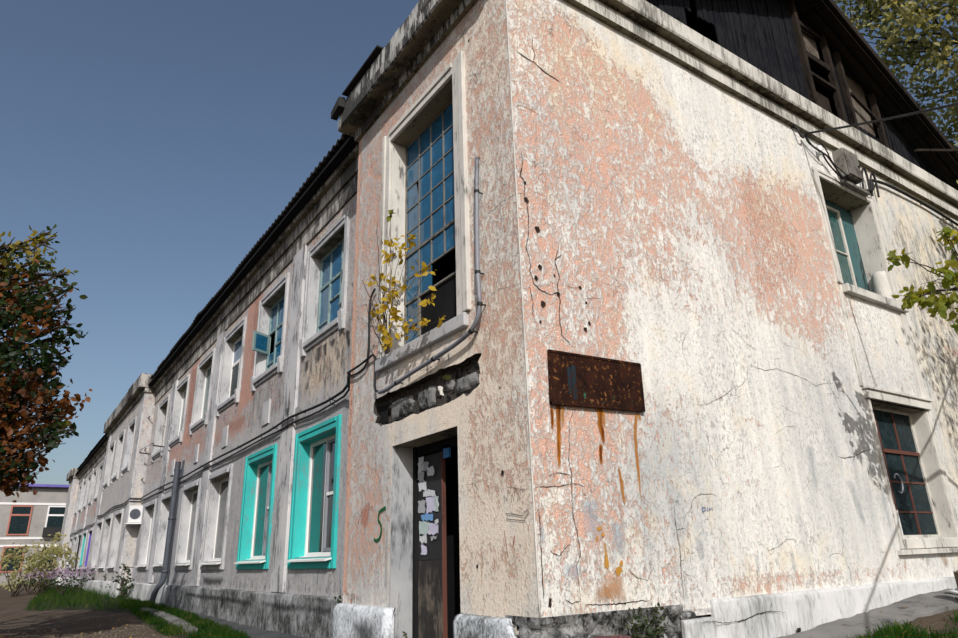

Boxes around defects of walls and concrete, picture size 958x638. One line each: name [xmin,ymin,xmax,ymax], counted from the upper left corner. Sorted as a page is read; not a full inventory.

crack [467,39,561,83]
crack [487,154,596,343]
spalling [374,353,481,426]
crack [708,330,826,404]
rust [550,405,564,467]
rust [597,408,605,464]
crack [507,412,651,605]